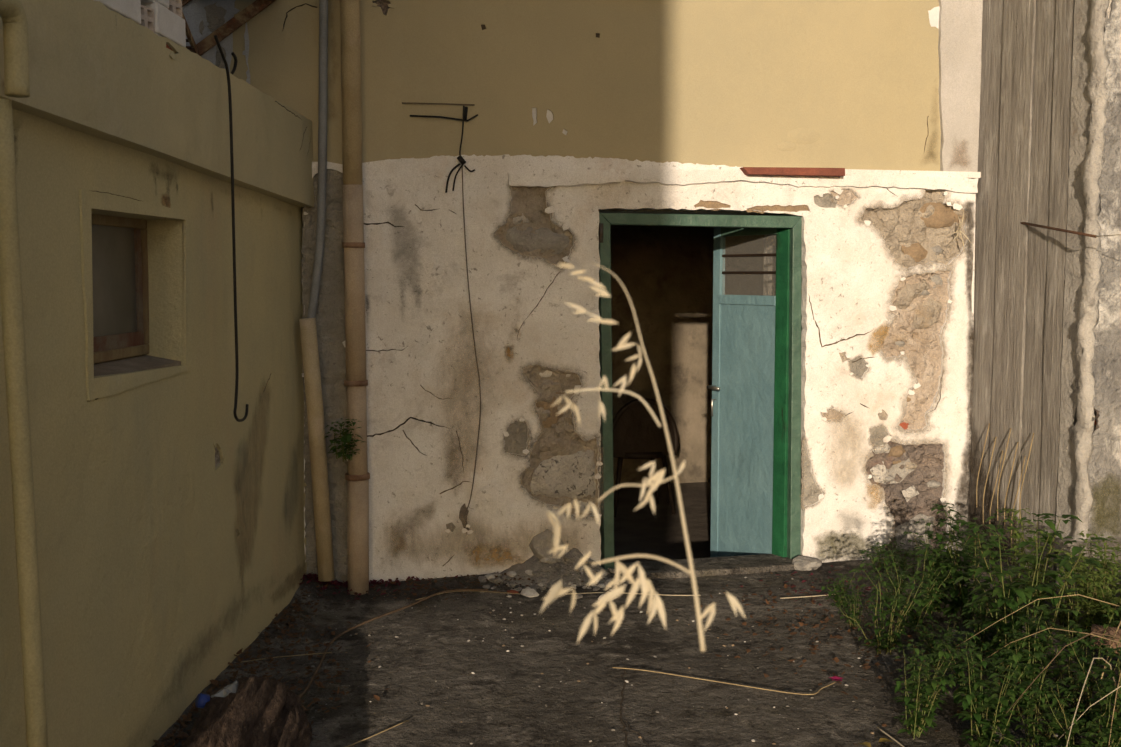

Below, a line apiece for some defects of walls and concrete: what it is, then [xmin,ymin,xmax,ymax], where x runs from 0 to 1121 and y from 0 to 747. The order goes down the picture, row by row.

flaking render [493,186,576,269]
flaking render [694,200,730,211]
crack [809,296,873,362]
flaking render [746,188,971,557]
crack [367,385,469,494]
flaking render [501,363,603,519]